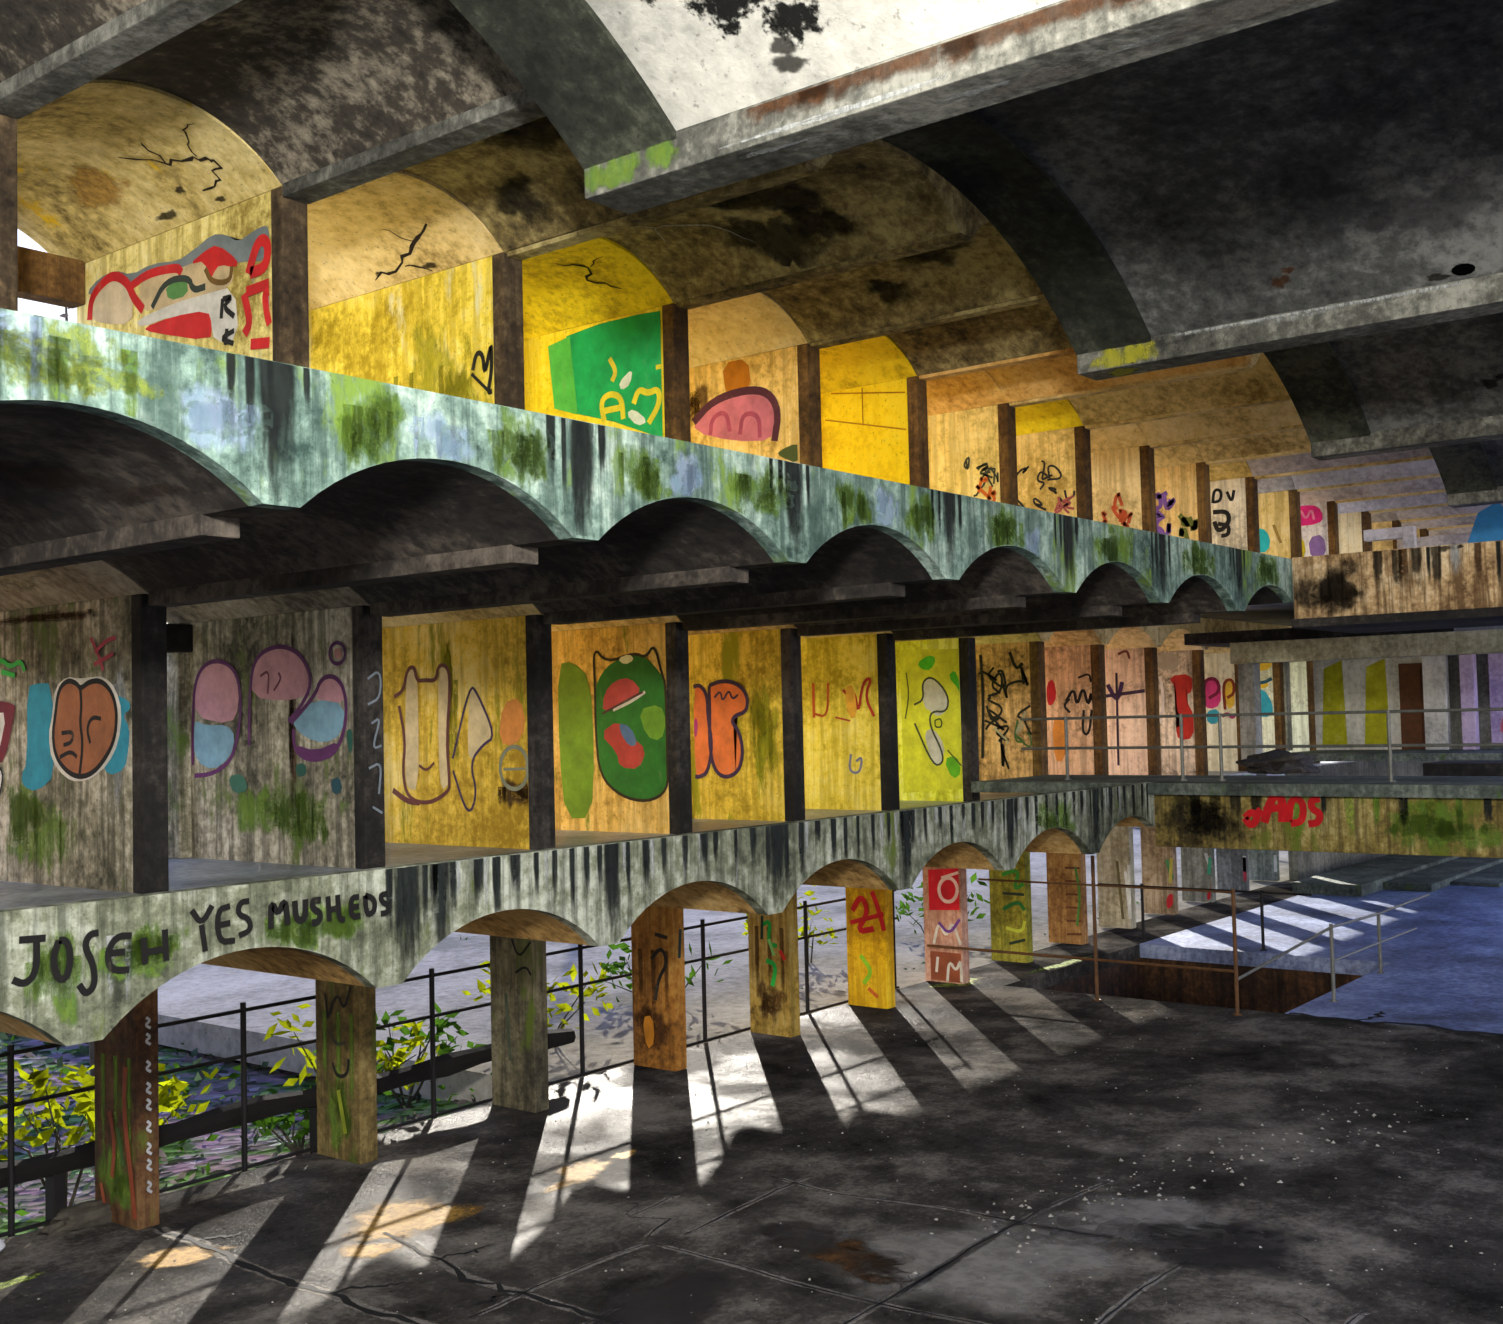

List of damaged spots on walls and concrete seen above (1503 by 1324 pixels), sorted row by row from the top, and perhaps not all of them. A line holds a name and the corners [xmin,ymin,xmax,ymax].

leakage [686,0,824,46]
crack [118,124,223,191]
crack [375,223,432,281]
leakage [47,335,70,400]
leakage [121,349,138,416]
leakage [226,352,310,482]
leakage [342,403,393,466]
leakage [1190,795,1261,826]
leakage [1293,796,1326,834]
leakage [1398,797,1408,823]
leakage [1483,798,1492,819]
leakage [386,779,1148,956]